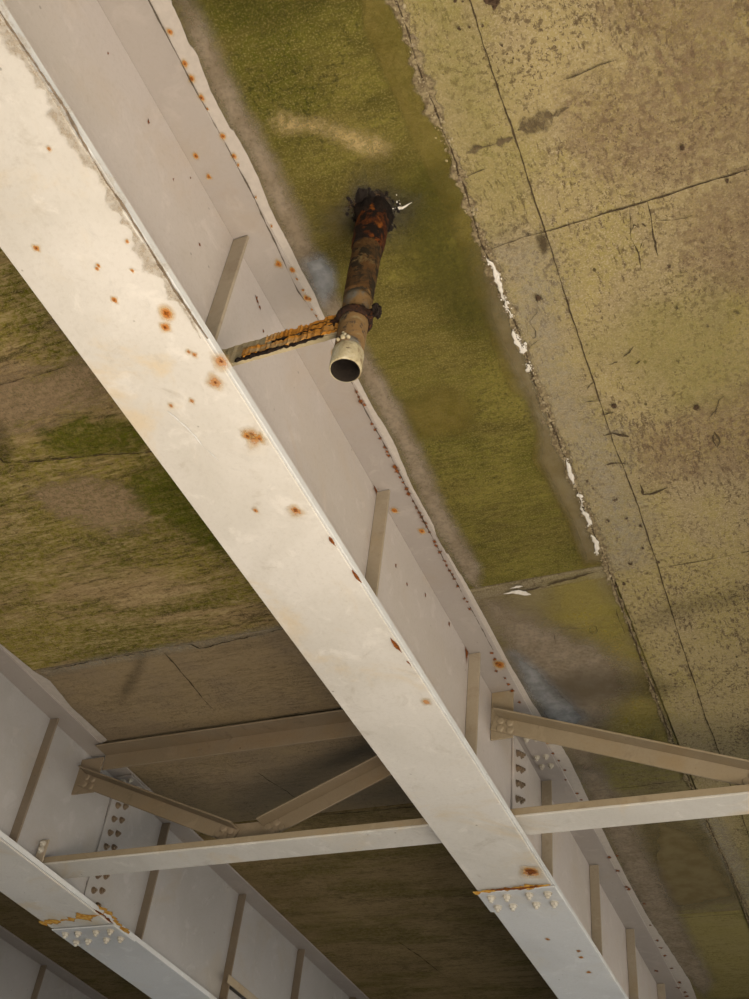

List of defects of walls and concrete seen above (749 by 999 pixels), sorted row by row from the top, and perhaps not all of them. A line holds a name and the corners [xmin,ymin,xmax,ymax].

leakage [360,0,603,587]
rust [161,308,172,331]
rust [241,261,339,357]
rust [243,431,263,444]
rust [473,868,550,895]
rust [39,905,130,934]